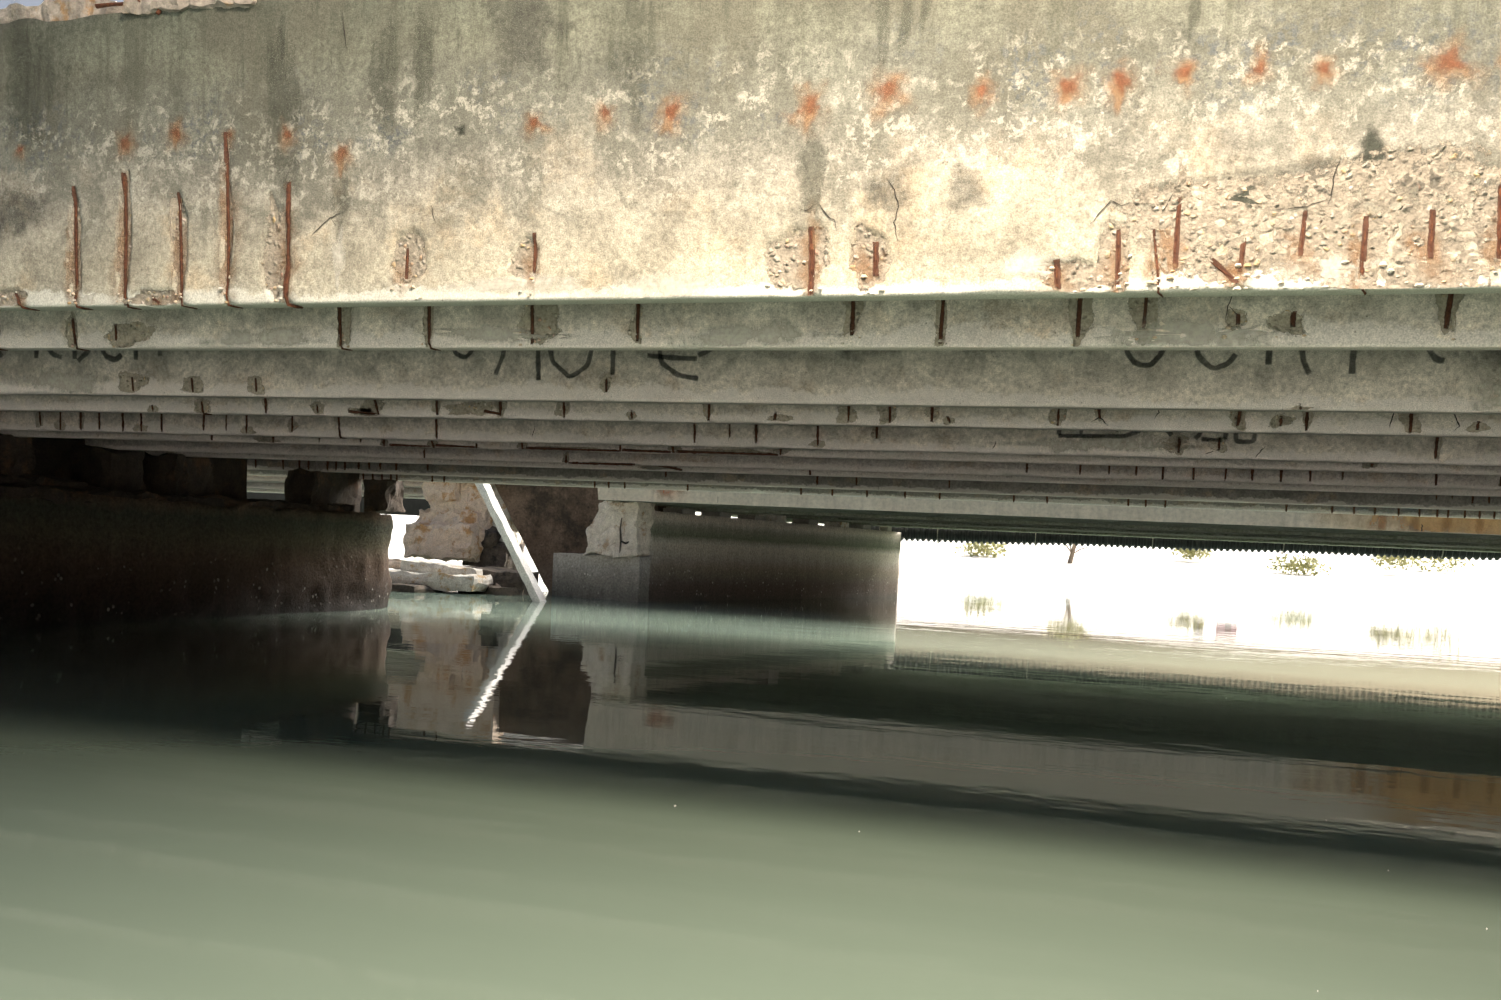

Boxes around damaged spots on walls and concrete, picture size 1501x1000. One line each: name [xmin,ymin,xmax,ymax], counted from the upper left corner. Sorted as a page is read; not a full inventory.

spalling [0,0,257,24]
corrosion [1061,81,1079,101]
spalling [1041,140,1501,347]
corrosion [1370,515,1501,535]